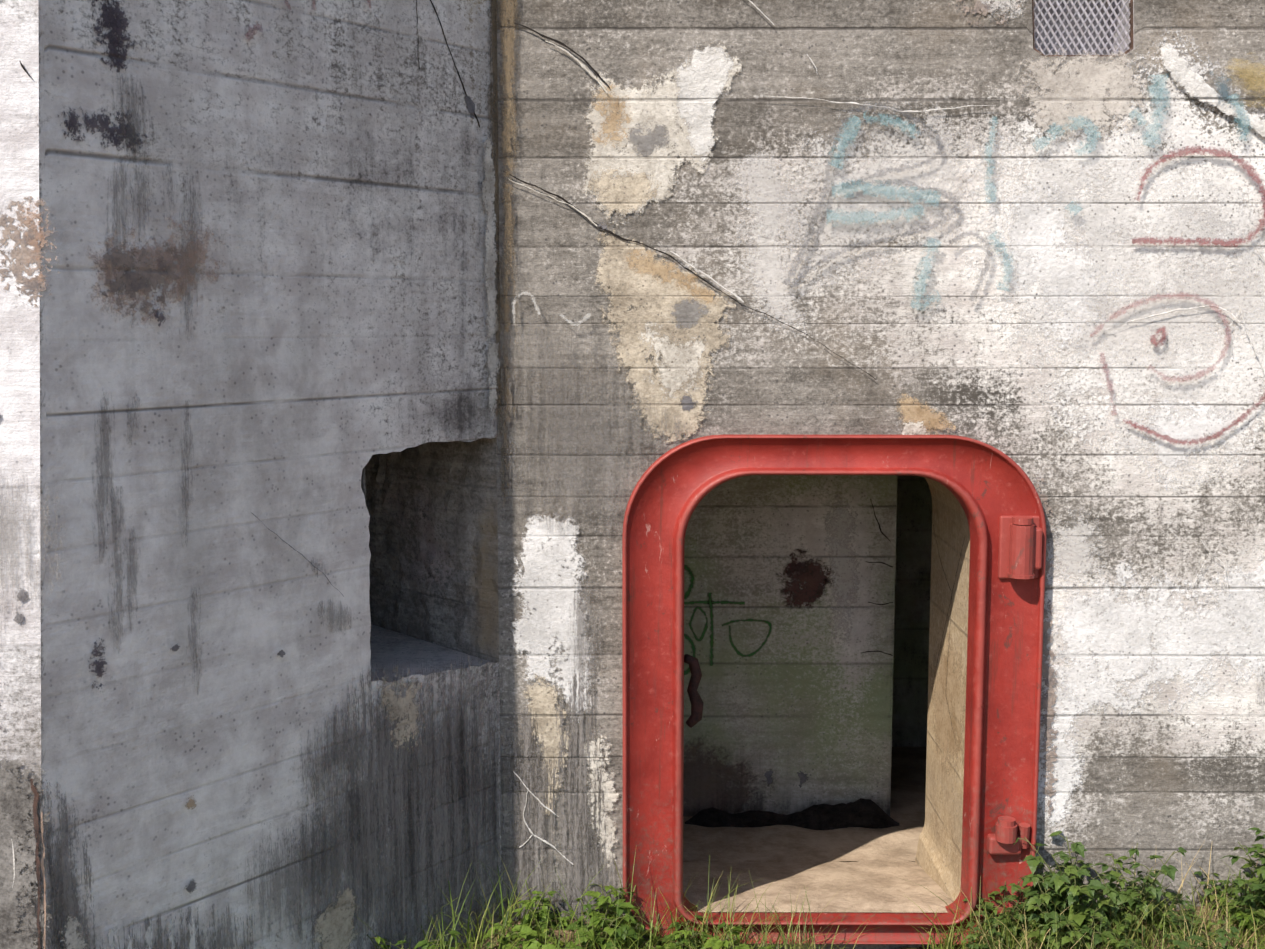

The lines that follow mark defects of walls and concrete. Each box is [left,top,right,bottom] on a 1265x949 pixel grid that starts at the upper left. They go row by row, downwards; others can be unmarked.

damp [58,107,147,151]
damp [89,0,134,72]
crack [416,0,480,127]
crack [508,20,610,94]
damp [1161,43,1265,137]
flaking render [583,42,742,442]
crack [503,171,876,380]
peeling [735,31,1265,490]
rust [776,549,836,608]
peeling [512,515,594,814]
damp [295,657,615,949]
peeling [584,735,619,869]